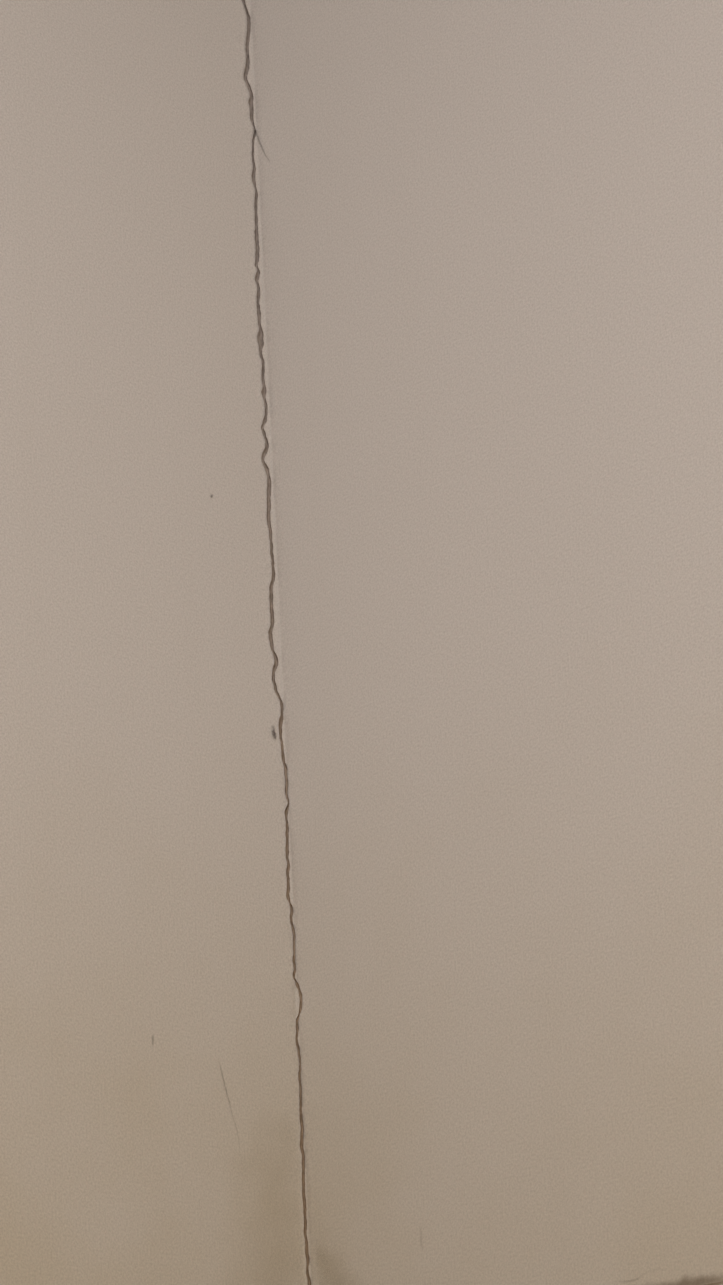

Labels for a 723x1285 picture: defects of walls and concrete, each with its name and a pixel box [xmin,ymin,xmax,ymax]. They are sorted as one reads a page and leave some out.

crack [242,0,311,1285]